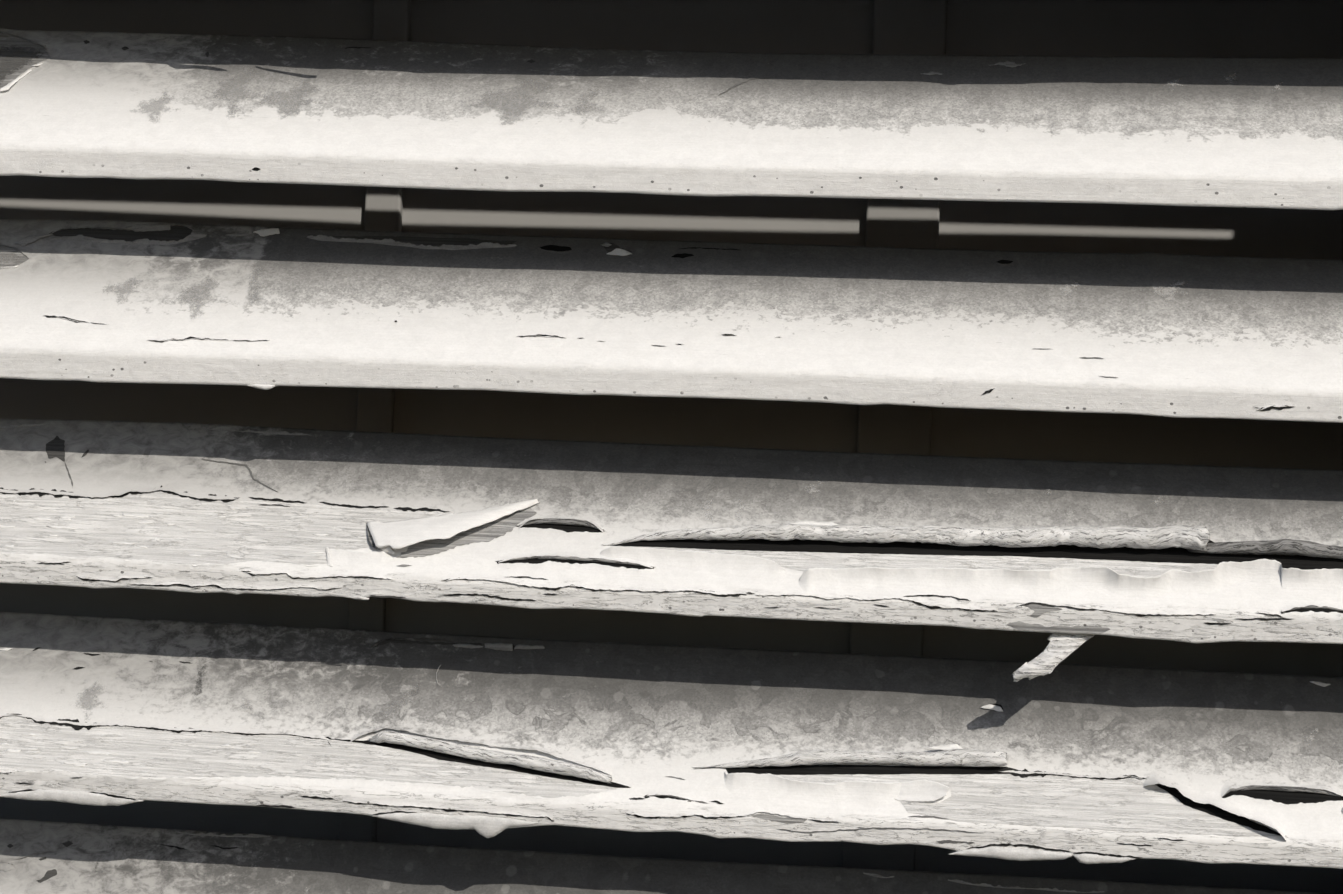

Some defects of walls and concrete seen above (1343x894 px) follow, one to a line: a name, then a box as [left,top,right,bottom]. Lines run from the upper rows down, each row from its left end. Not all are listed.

peeling [0,30,53,96]
crack [0,458,450,512]
peeling [0,436,654,581]
crack [0,710,334,746]
peeling [0,715,723,809]
peeling [1143,770,1343,841]